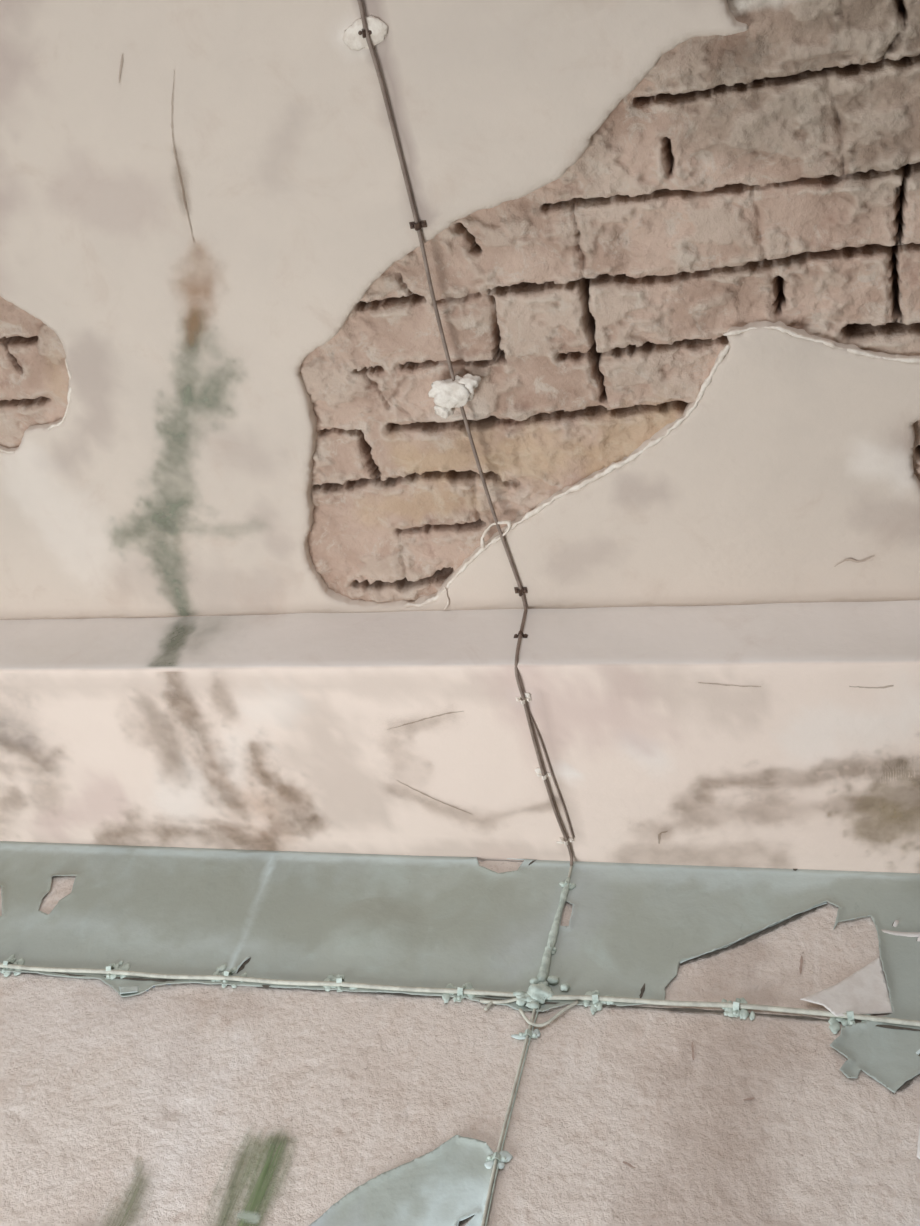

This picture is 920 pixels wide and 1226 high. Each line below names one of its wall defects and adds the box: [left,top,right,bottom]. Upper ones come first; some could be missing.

spalling [0,296,71,454]
damp [187,312,200,351]
spalling [300,0,920,610]
damp [165,380,220,460]
damp [126,498,190,666]
damp [861,779,920,829]
peeling [39,876,76,914]
peeling [0,902,920,1226]
damp [221,1137,285,1226]